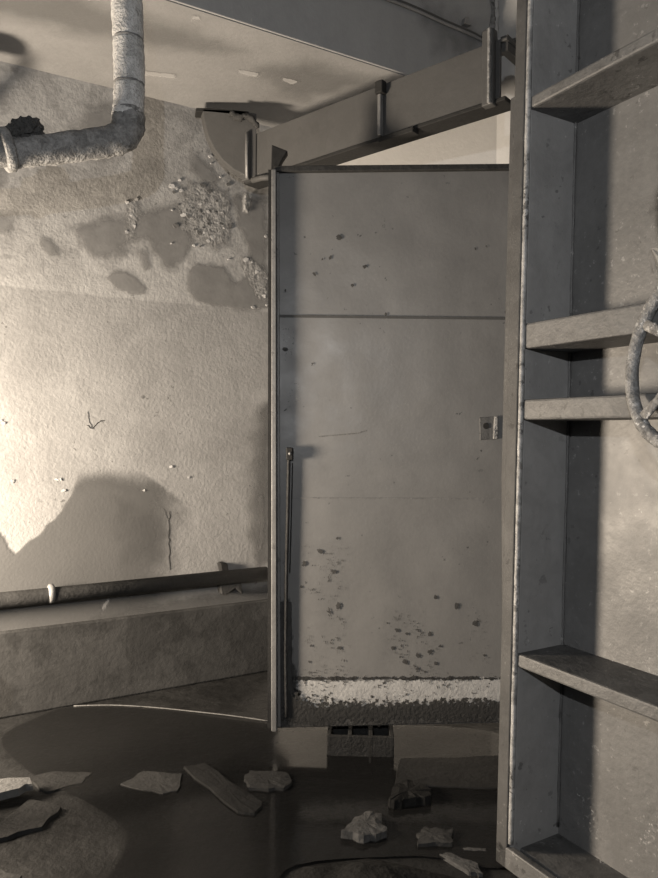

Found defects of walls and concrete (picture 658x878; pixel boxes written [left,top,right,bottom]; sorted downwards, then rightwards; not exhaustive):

peeling [169,176,232,250]
peeling [242,257,268,309]